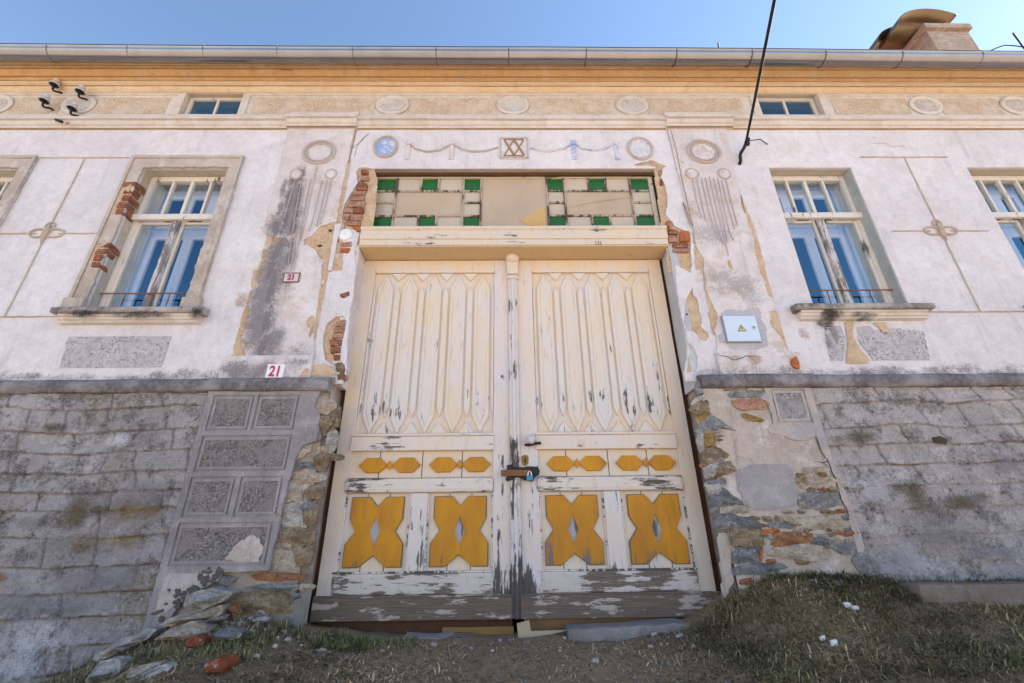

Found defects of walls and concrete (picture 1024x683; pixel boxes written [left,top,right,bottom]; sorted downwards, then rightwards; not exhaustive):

spalling [111,182,146,222]
spalling [88,243,120,273]
leakage [258,169,305,355]
flaking render [651,162,717,341]
flaking render [770,311,800,369]
leakage [818,309,876,347]
flaking render [845,322,870,363]
spalling [151,160,378,629]
spalling [686,347,879,592]